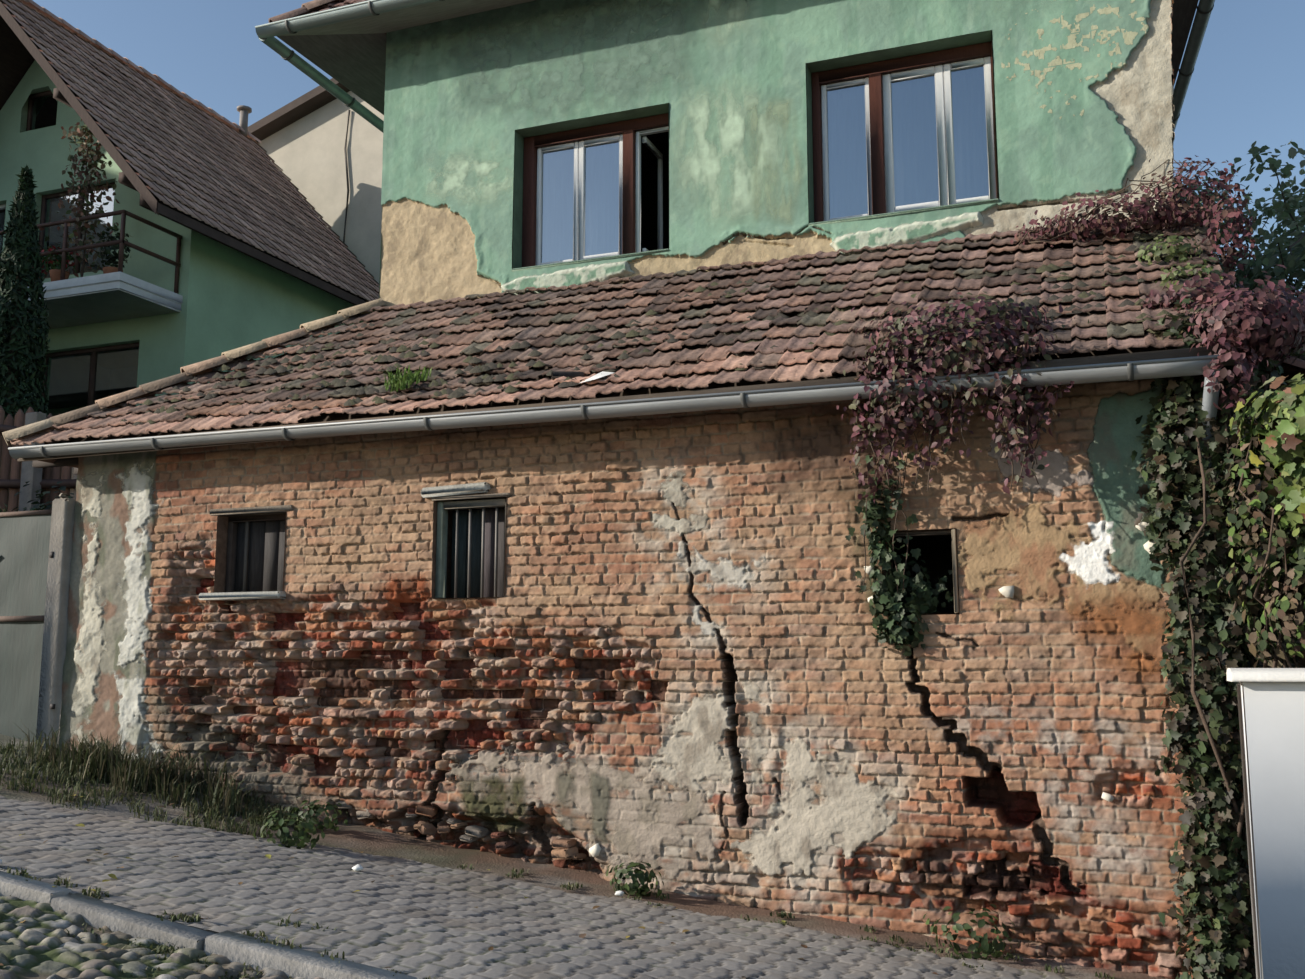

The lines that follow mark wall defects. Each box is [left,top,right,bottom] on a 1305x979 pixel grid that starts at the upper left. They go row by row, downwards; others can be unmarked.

flaking render [961,0,1173,241]
flaking render [377,197,509,313]
flaking render [598,226,840,291]
flaking render [998,586,1014,598]
flaking render [1060,520,1119,585]
flaking render [1135,520,1160,556]
spalling [71,463,669,803]
crack [672,503,781,854]
crack [907,624,1002,772]
flaking render [589,843,601,857]
crack [1032,813,1081,893]